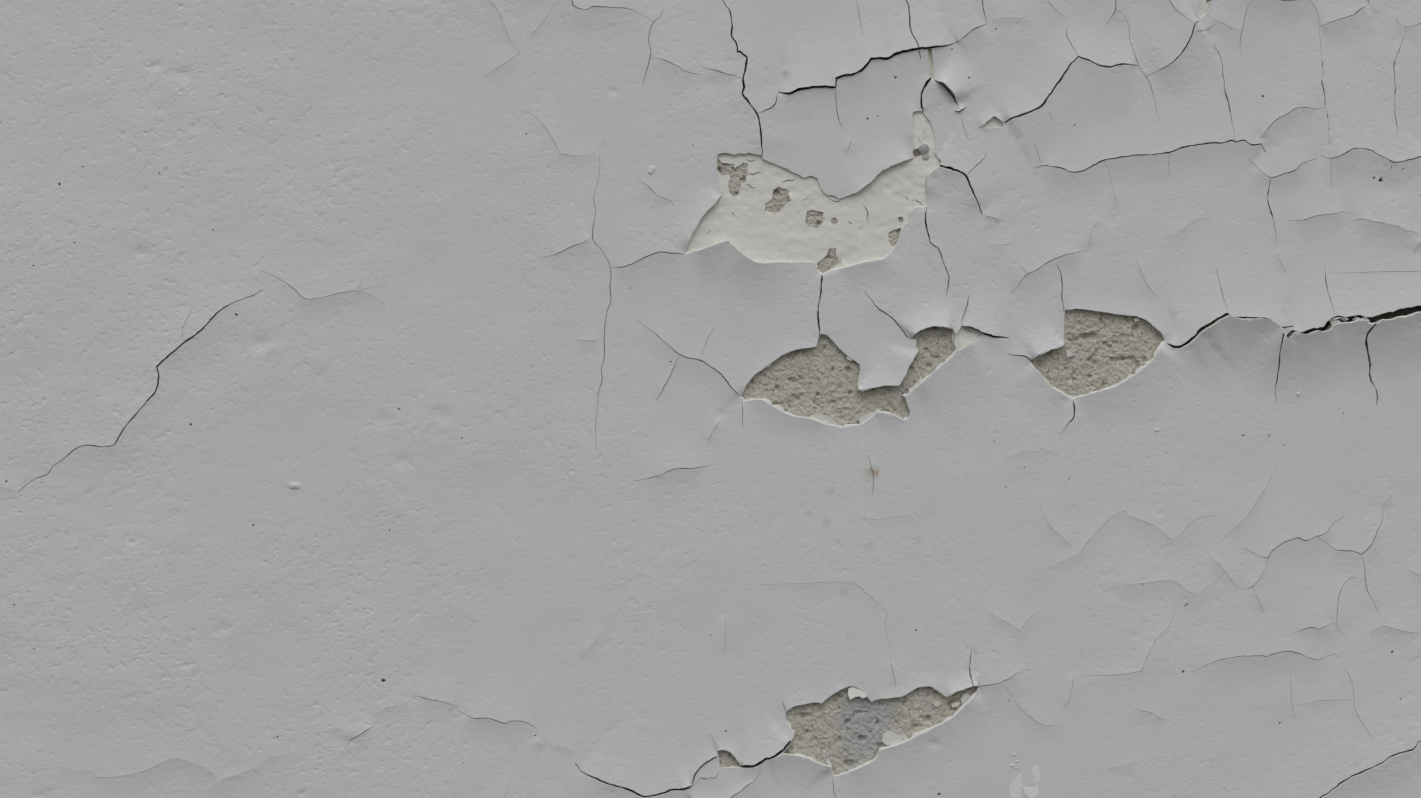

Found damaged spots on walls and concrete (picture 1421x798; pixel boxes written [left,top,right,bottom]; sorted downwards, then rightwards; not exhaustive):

peeling [685,108,942,277]
crack [484,0,1421,405]
crack [2,271,383,492]
crack [524,110,743,481]
peeling [740,325,984,428]
crack [1005,401,1075,462]
peeling [1026,309,1166,400]
crack [969,466,1421,798]
peeling [717,750,744,768]
peeling [778,686,979,777]